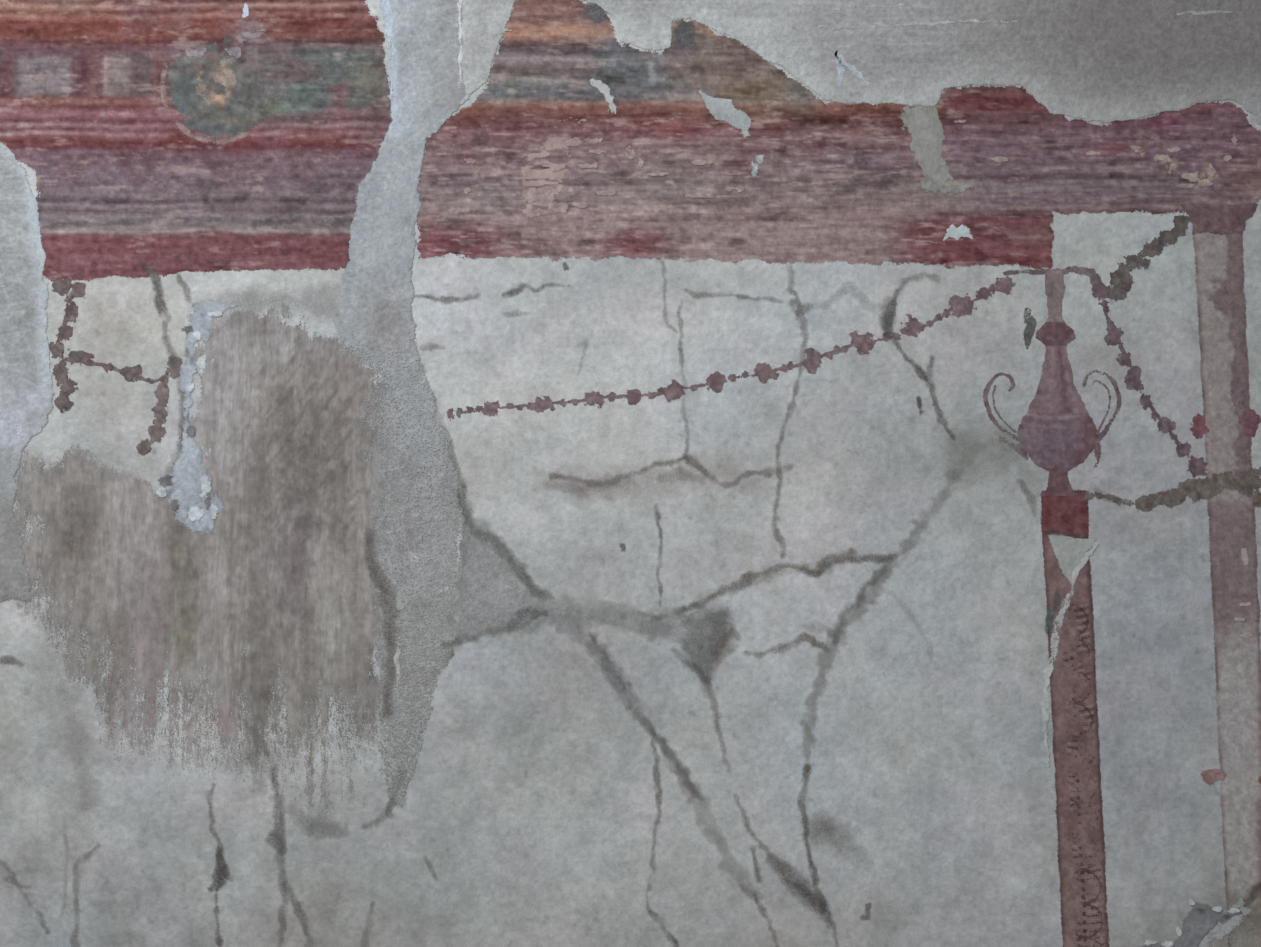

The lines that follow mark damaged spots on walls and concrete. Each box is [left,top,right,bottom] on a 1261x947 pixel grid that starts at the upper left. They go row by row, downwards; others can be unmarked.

peeling [513,114,616,218]
peeling [590,78,617,114]
peeling [698,90,751,138]
peeling [685,155,764,199]
peeling [901,105,973,194]
peeling [1131,134,1237,188]
crack [366,534,394,714]
crack [425,276,955,946]
peeling [1041,530,1099,767]
crack [209,790,227,945]
crack [267,773,327,941]
spalling [1148,902,1243,947]